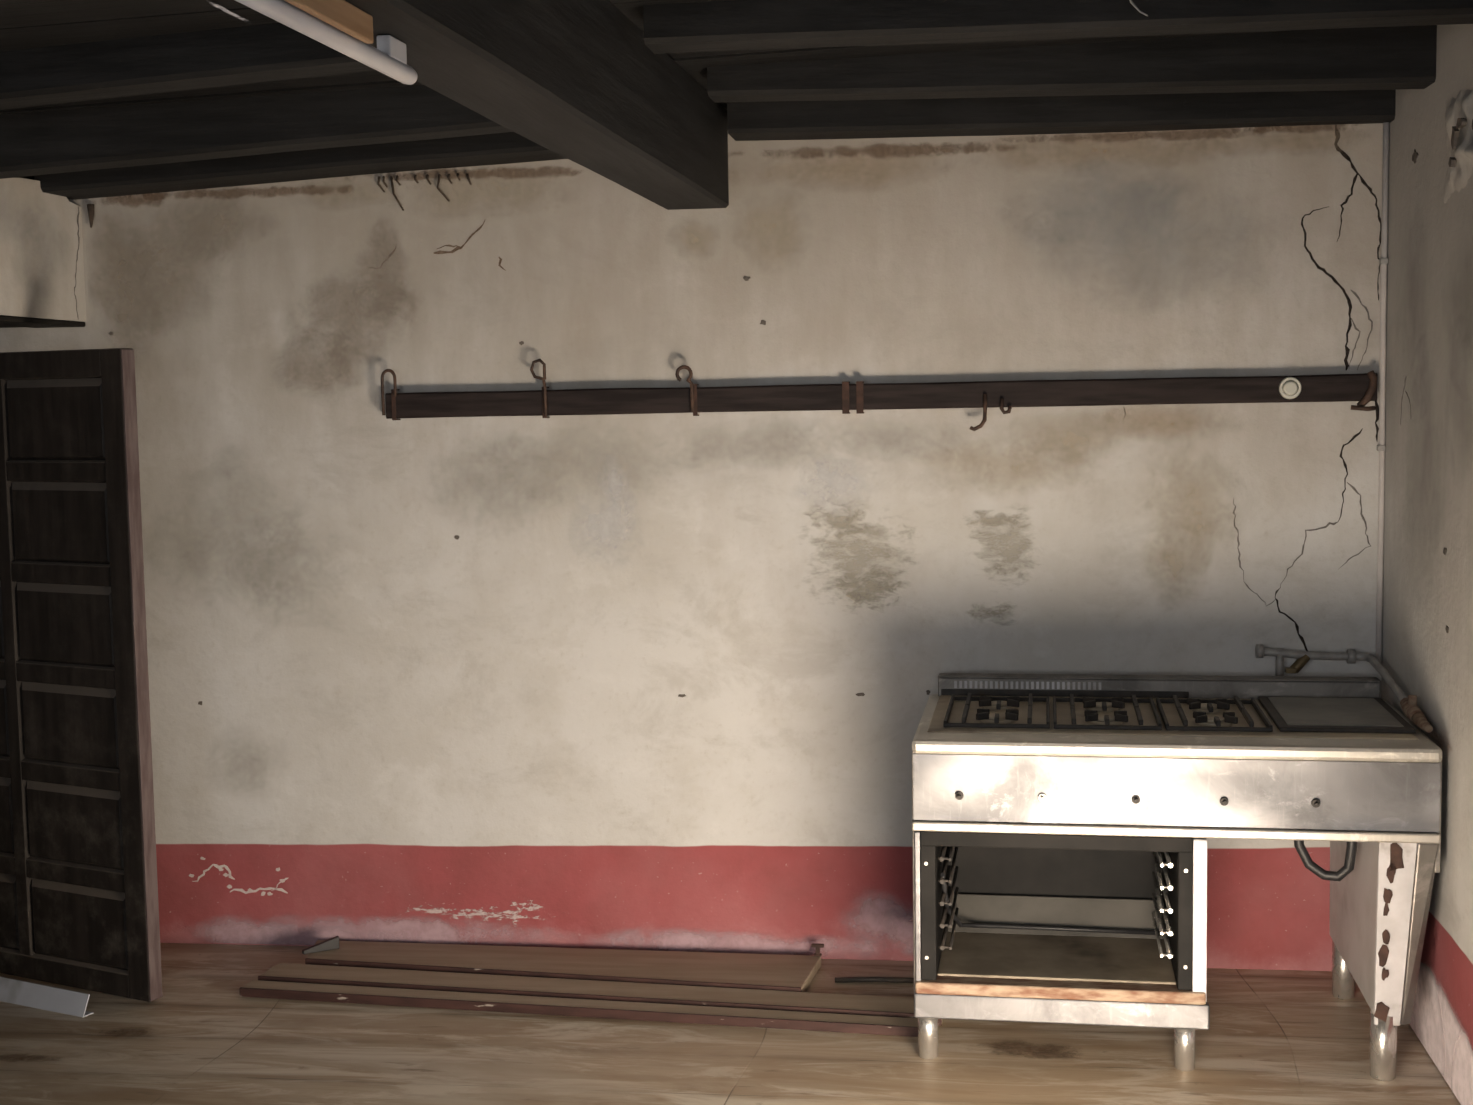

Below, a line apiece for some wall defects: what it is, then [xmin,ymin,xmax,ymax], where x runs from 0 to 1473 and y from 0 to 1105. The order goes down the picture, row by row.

crack [1301,124,1382,371]
crack [1233,376,1411,651]
peeling [189,857,288,896]
peeling [407,900,555,925]
leakage [641,933,832,955]
leakage [854,900,913,952]